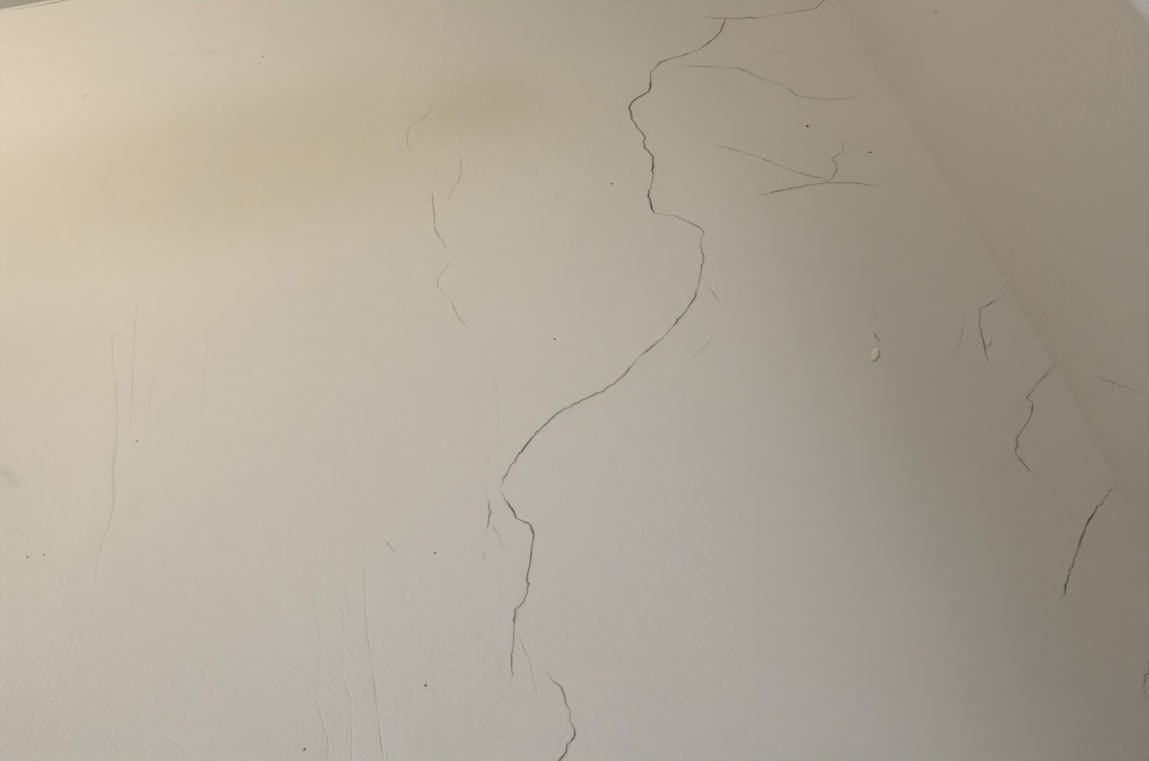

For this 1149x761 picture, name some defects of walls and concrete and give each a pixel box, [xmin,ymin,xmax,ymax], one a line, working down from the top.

crack [488,16,764,673]